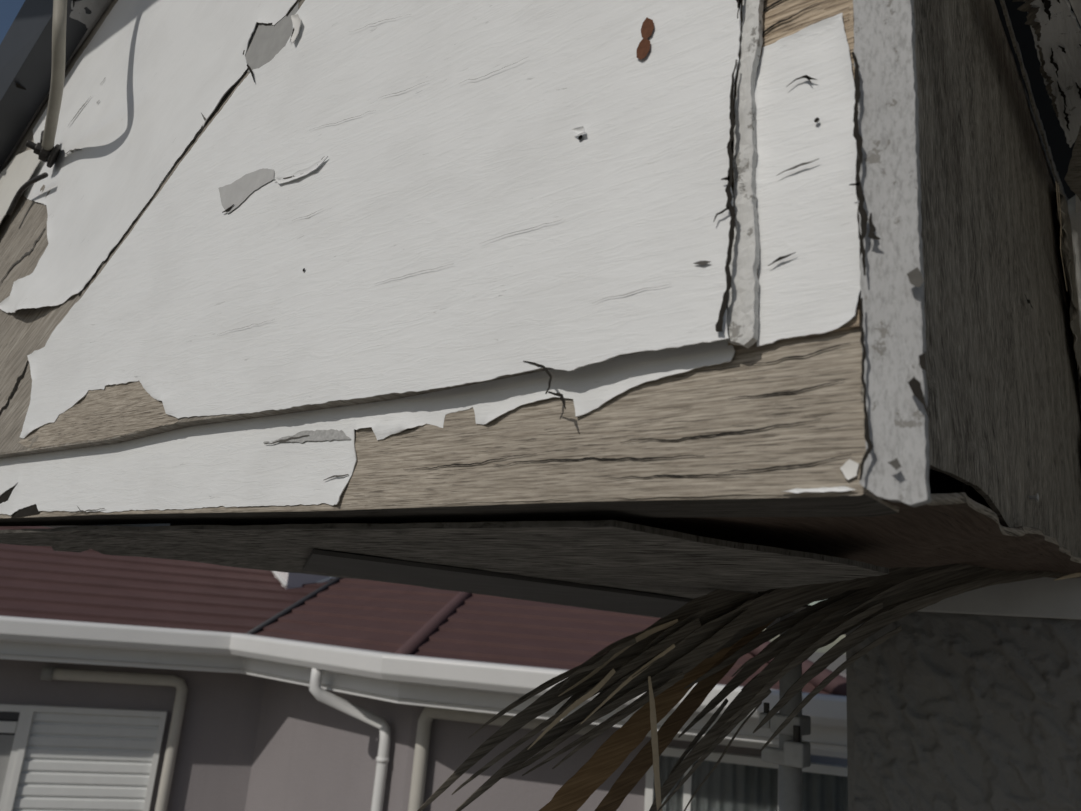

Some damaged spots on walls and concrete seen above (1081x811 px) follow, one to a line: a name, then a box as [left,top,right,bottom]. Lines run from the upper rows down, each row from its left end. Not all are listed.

peeling [243,2,301,82]
rust [636,18,654,60]
peeling [1012,0,1081,201]
crack [79,68,248,296]
peeling [218,156,328,214]
crack [713,59,737,332]
peeling [0,149,179,453]
crack [768,252,796,266]
peeling [907,267,924,288]
crack [523,361,566,410]
peeling [263,328,869,507]
peeling [908,352,931,422]